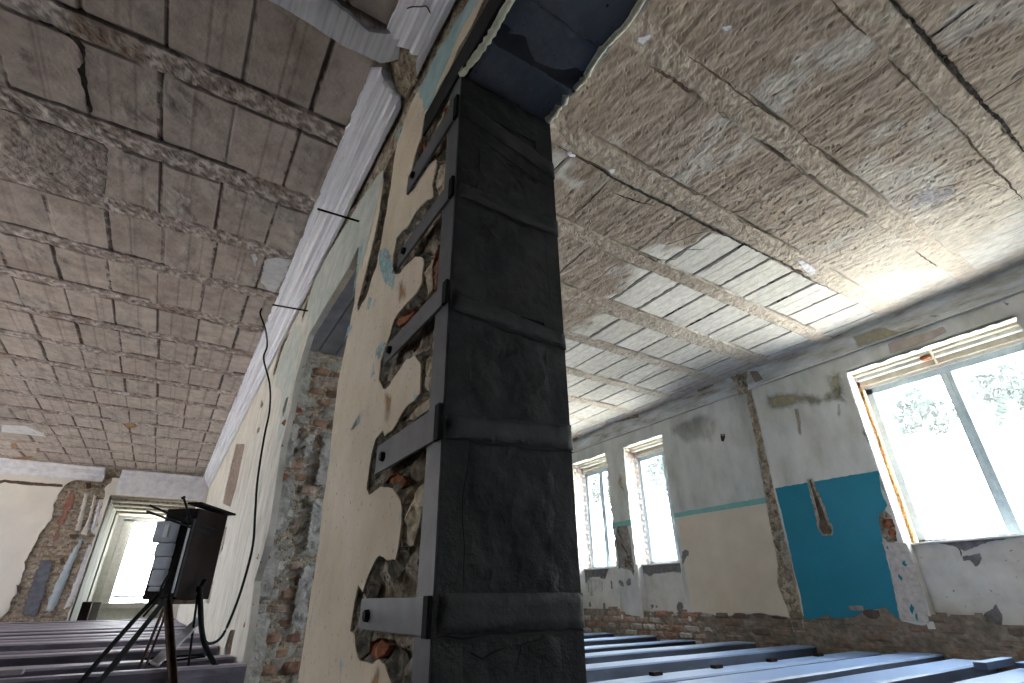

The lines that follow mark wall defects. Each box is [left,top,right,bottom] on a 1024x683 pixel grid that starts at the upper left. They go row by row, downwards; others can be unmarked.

crack [36,20,93,113]
crack [688,56,1023,211]
crack [890,0,1024,152]
flaking render [274,282,314,374]
flaking render [322,0,469,683]
flaking render [6,472,112,622]
flaking render [224,351,343,683]
flaking render [583,371,1024,673]